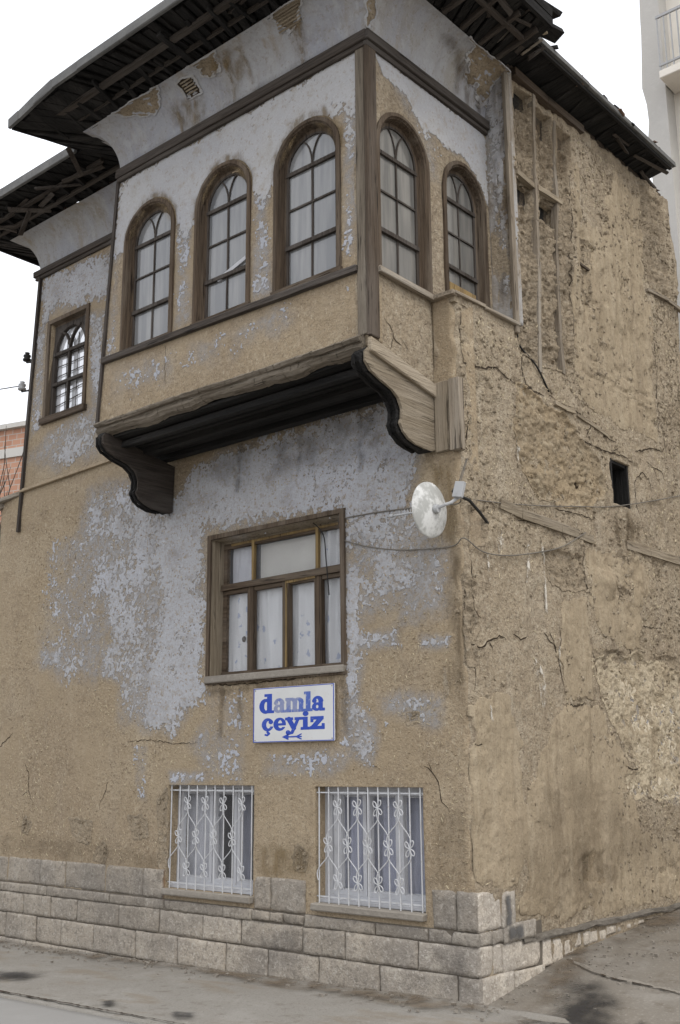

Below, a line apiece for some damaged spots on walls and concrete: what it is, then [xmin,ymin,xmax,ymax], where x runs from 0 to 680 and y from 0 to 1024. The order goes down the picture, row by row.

flaking render [270,0,303,35]
peeling [30,49,356,467]
crack [459,323,666,517]
peeling [40,402,449,783]
crack [469,560,631,717]
crack [128,738,199,746]
crack [424,765,451,812]